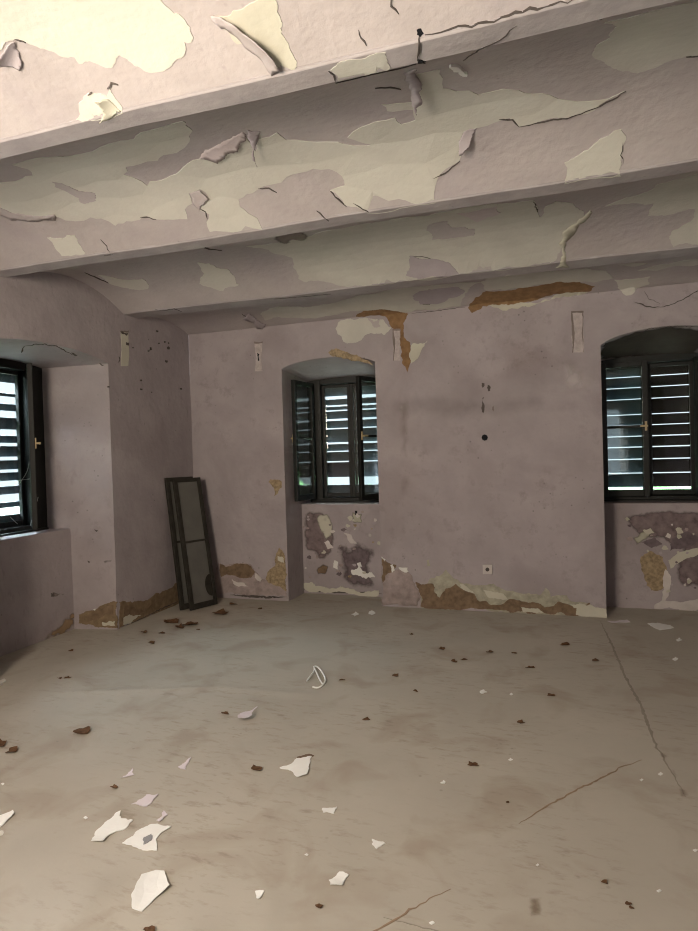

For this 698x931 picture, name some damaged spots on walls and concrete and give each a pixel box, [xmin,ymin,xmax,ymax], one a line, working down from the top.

peeling [0,0,193,73]
peeling [211,0,297,76]
crack [417,0,572,61]
peeling [0,52,626,372]
peeling [605,173,698,247]
spalling [79,583,179,629]
spalling [215,548,287,597]
peeling [302,511,380,597]
spalling [416,569,607,618]
peeling [625,511,698,611]